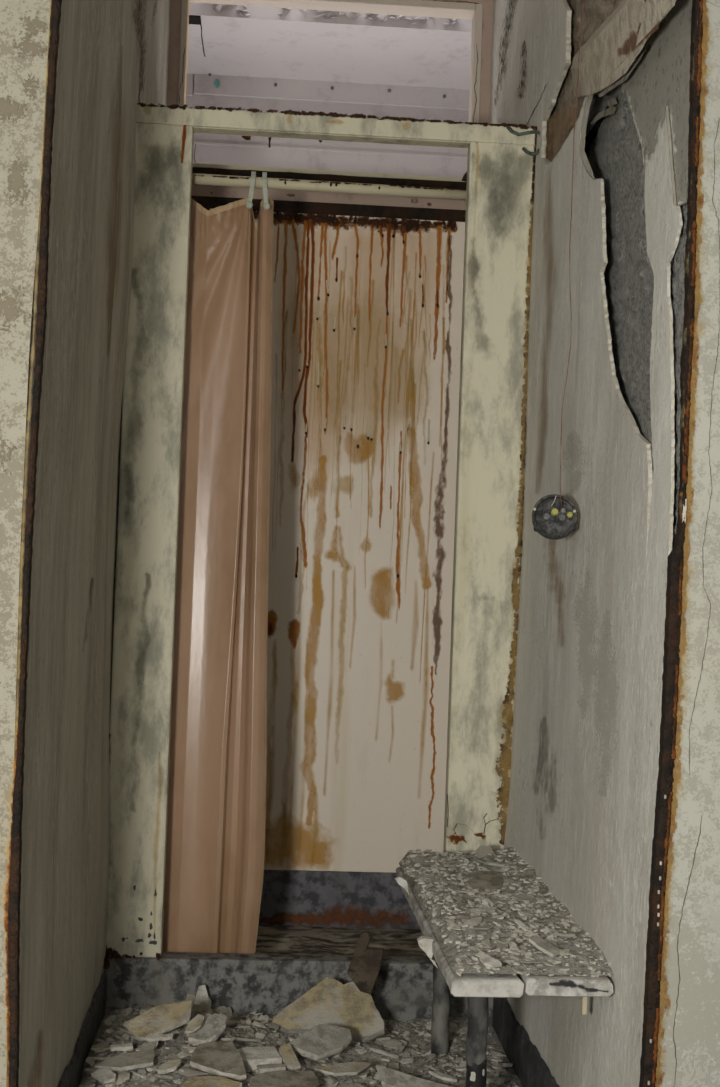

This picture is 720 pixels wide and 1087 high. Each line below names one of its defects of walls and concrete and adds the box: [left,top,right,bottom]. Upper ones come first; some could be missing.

damp [265,456,347,865]
corrosion [137,102,537,845]
spalling [545,0,692,550]
corrosion [655,0,709,1087]
crack [673,817,702,1085]
crack [689,119,720,775]